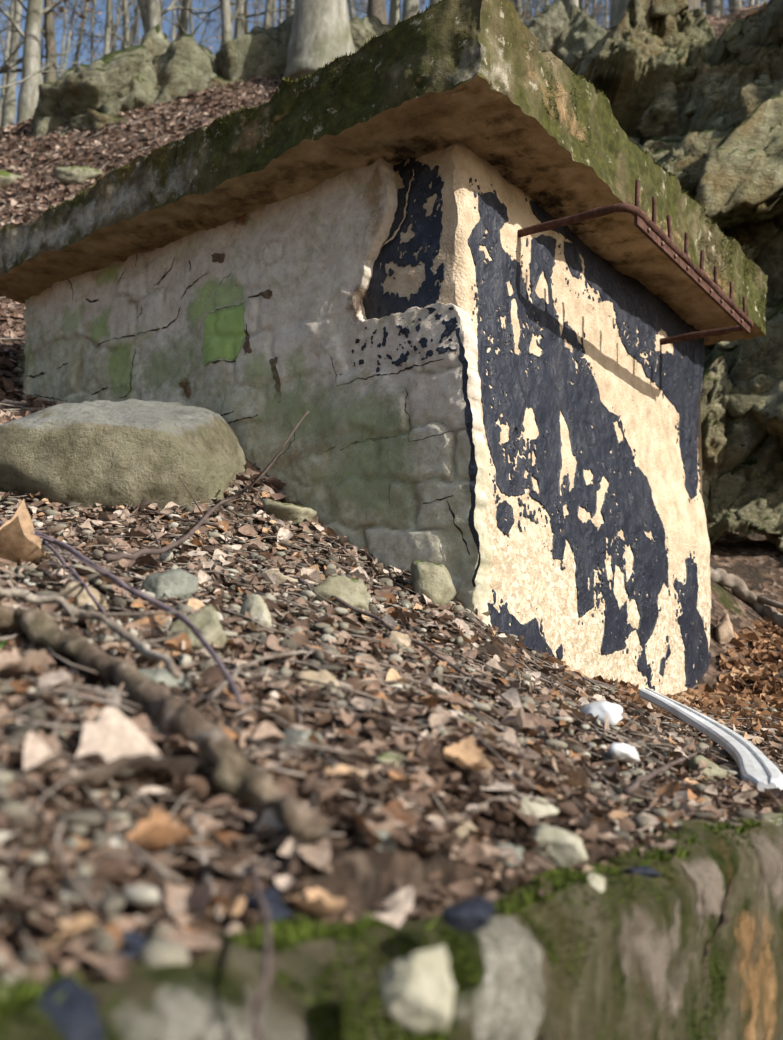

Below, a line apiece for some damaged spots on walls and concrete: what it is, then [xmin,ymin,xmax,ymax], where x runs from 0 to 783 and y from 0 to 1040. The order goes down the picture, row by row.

crack [24,363,67,401]
crack [67,254,137,303]
crack [91,258,272,398]
damp [149,281,246,385]
crack [221,411,258,423]
crack [323,327,481,587]
peeling [351,158,460,373]
peeling [468,178,712,691]